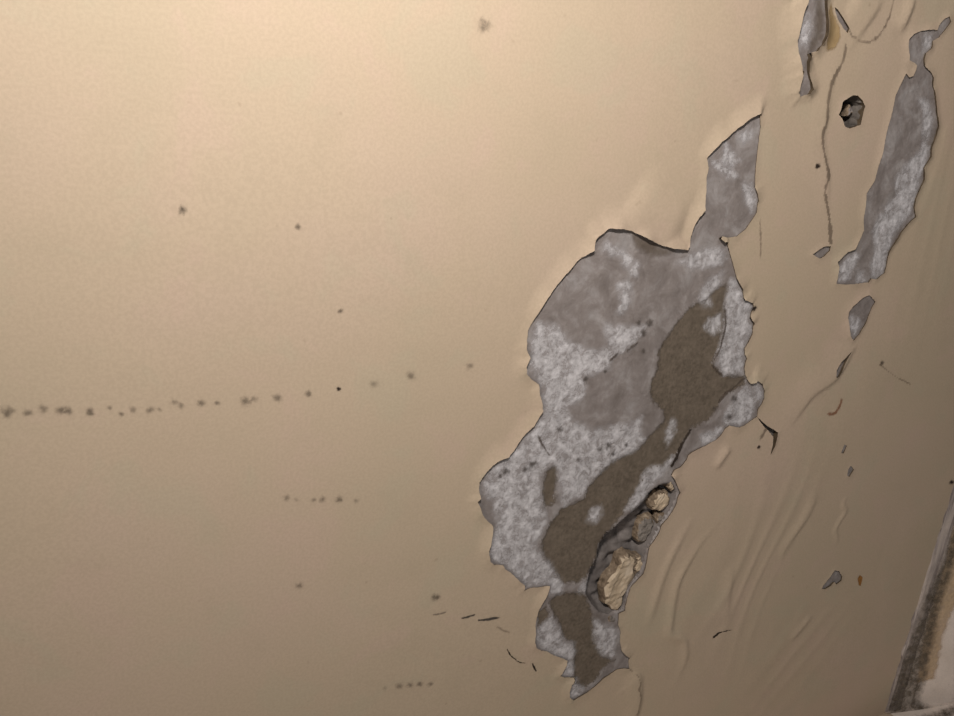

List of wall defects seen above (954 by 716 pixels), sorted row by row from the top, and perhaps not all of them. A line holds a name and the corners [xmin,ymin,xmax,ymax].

peeling [791,0,831,105]
peeling [811,10,954,381]
peeling [469,106,769,706]
leakage [918,532,954,682]